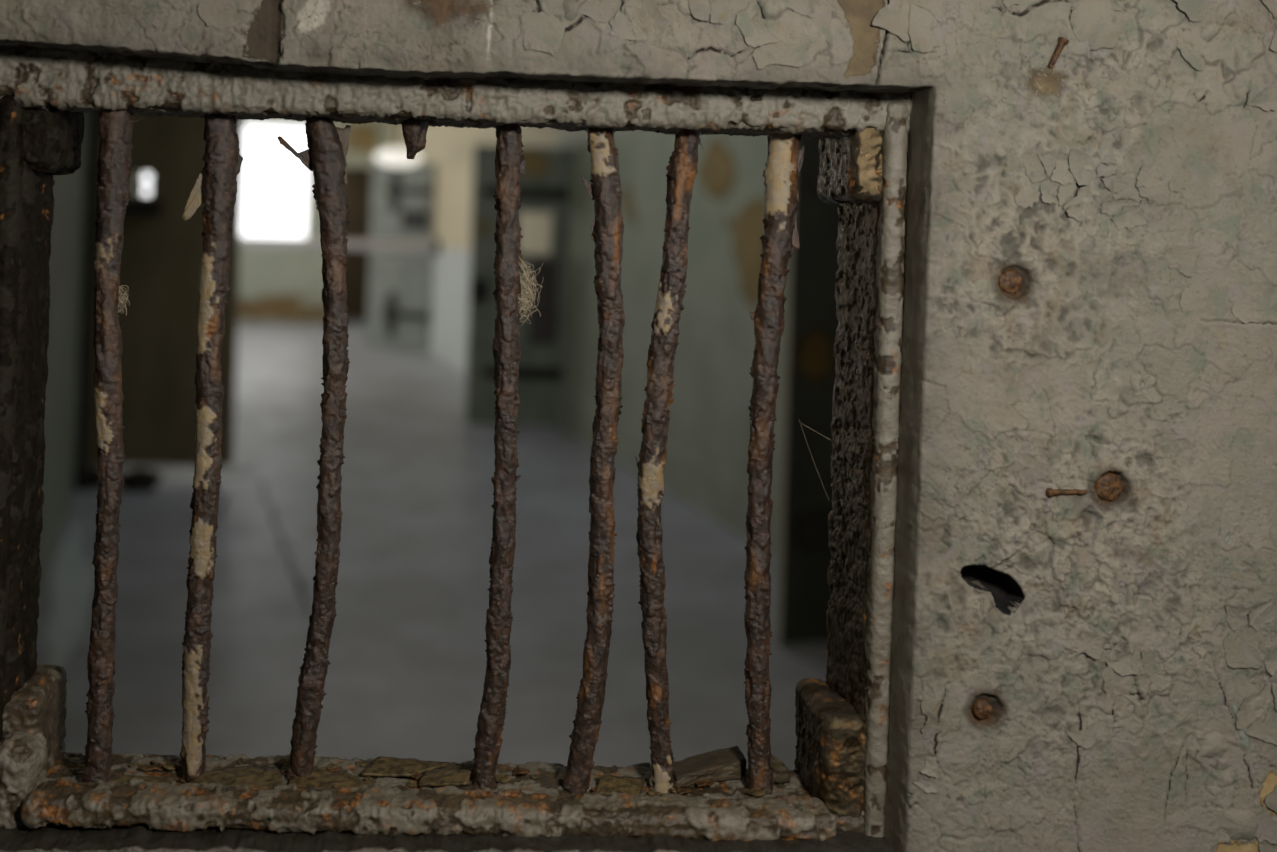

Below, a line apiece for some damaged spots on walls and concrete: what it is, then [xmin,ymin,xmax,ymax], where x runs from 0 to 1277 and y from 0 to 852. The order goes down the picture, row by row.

crack [536,0,586,32]
crack [687,47,744,60]
peeling [1014,148,1195,230]
peeling [1223,599,1277,745]
crack [1073,706,1082,852]
peeling [1216,772,1277,852]